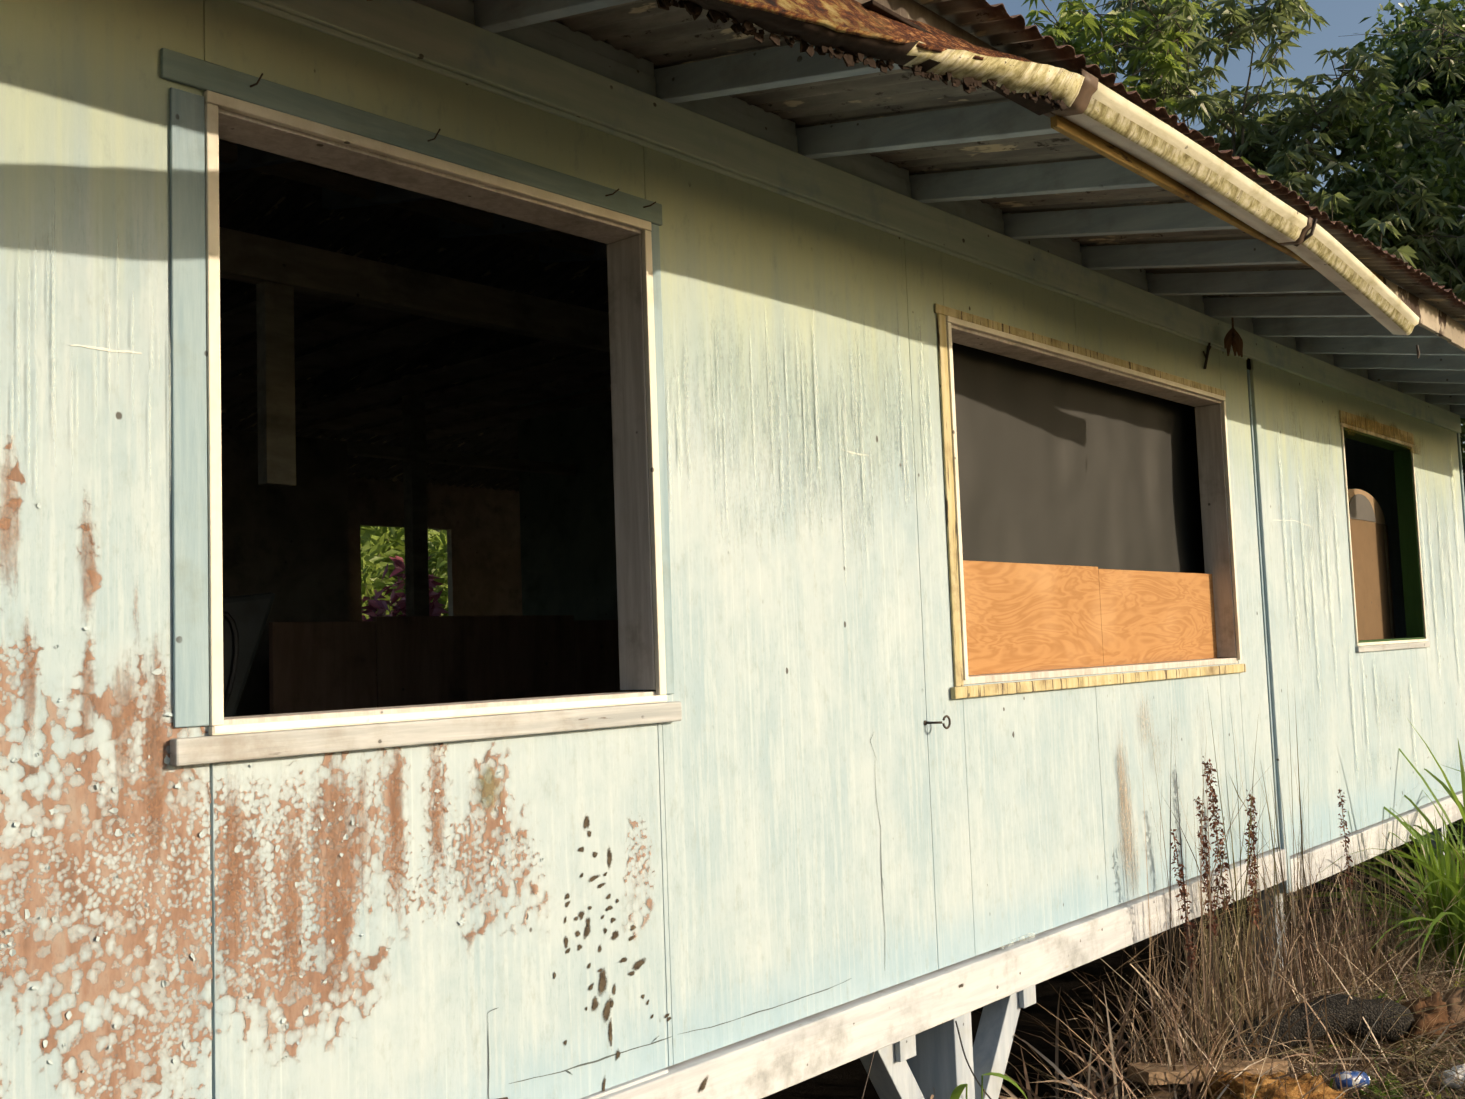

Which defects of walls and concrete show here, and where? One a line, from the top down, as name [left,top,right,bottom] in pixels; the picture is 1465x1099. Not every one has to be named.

corrosion [682,0,1085,107]
peeling [0,440,41,566]
peeling [80,524,102,599]
peeling [0,626,548,1099]
peeling [624,820,655,935]